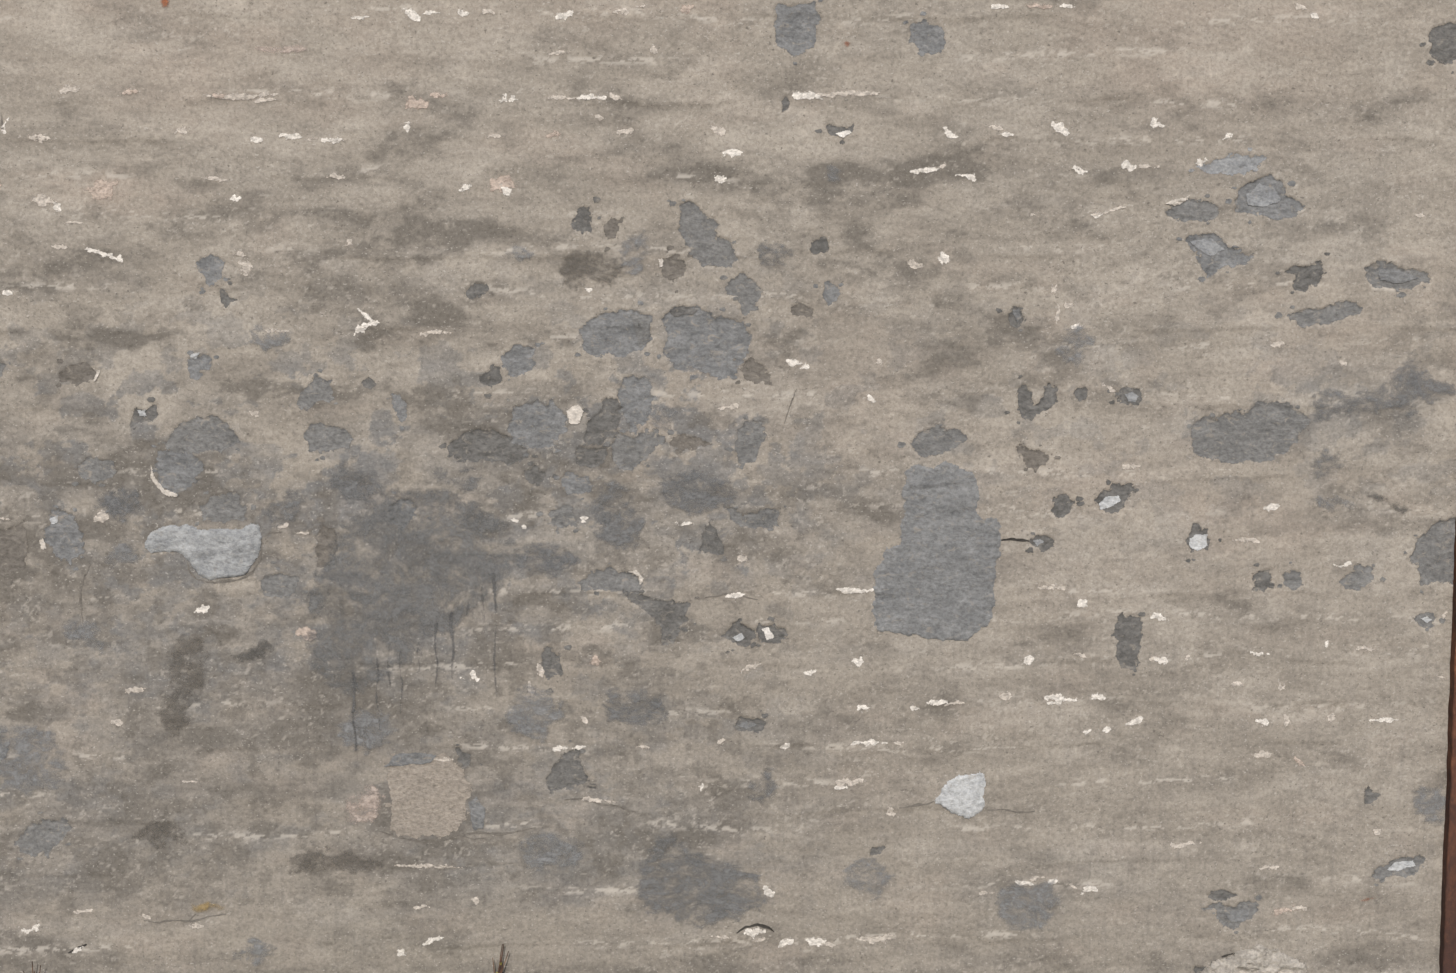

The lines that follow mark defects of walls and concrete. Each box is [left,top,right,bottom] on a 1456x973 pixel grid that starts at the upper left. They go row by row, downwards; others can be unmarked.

flaking render [772,0,823,65]
flaking render [1165,133,1305,282]
flaking render [466,283,489,300]
flaking render [571,196,772,385]
flaking render [786,359,810,369]
flaking render [130,397,158,430]
flaking render [150,415,241,497]
flaking render [438,342,767,486]
flaking render [1187,401,1311,464]
leakage [306,461,578,750]
flaking render [1111,612,1190,676]
leakage [639,837,766,924]